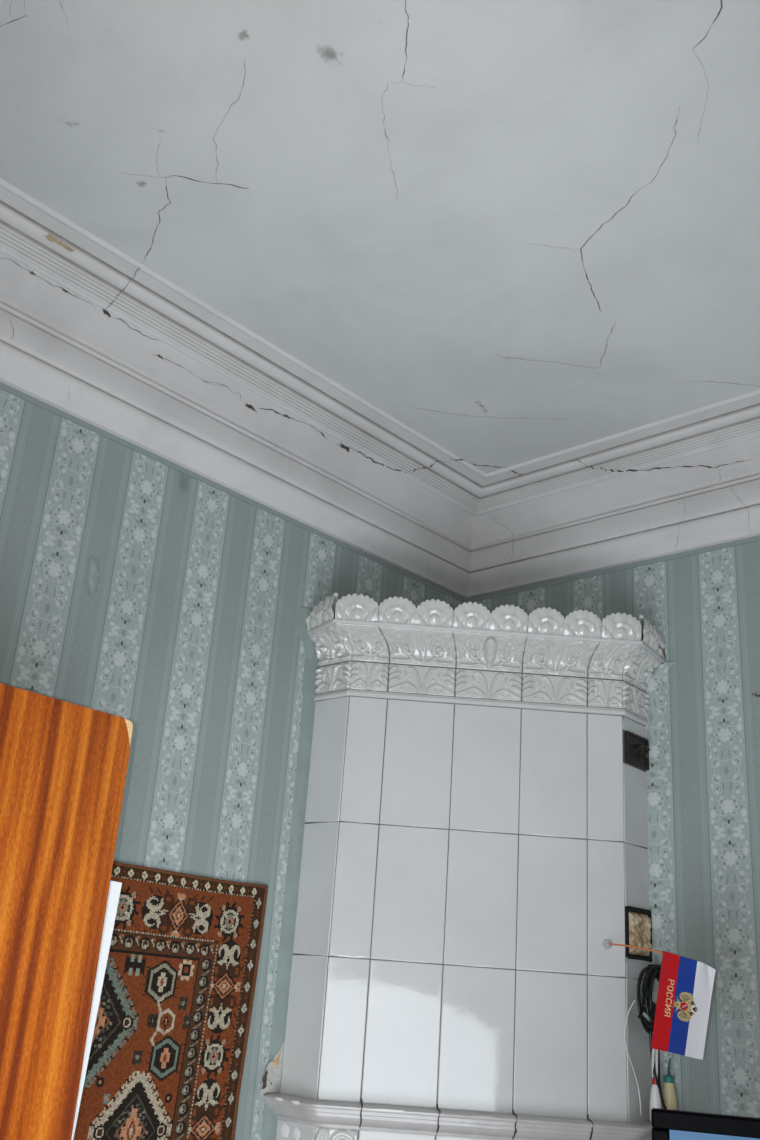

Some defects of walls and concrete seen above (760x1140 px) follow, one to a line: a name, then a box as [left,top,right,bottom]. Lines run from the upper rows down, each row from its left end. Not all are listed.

crack [2,57,523,476]
crack [382,0,435,200]
crack [499,0,723,368]
crack [574,460,752,533]